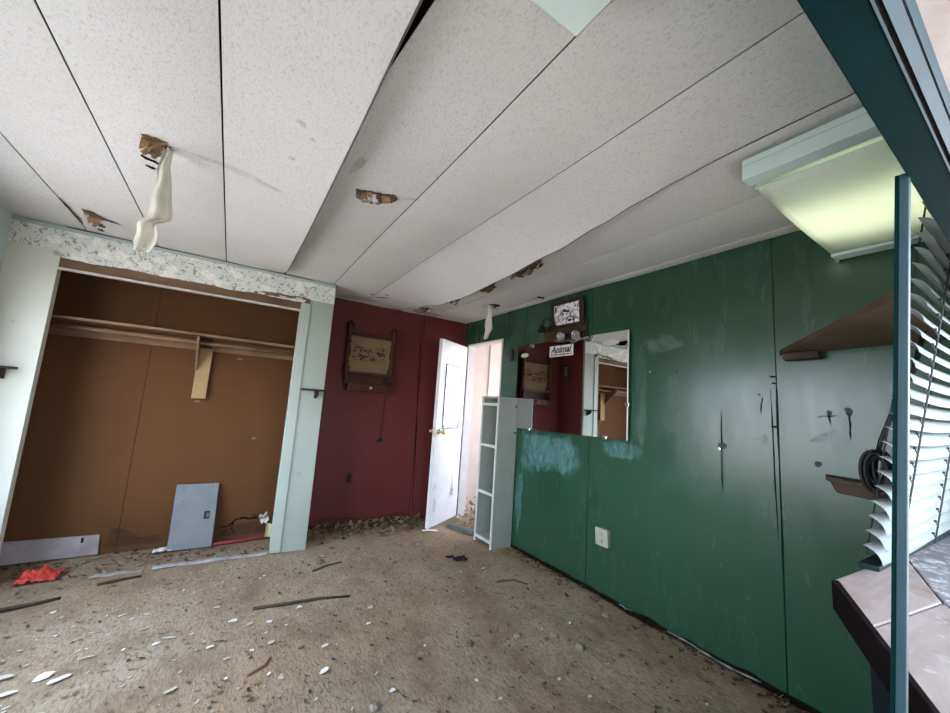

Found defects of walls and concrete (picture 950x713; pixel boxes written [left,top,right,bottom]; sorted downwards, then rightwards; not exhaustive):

peeling [138,136,168,155]
peeling [356,188,396,204]
peeling [79,211,101,227]